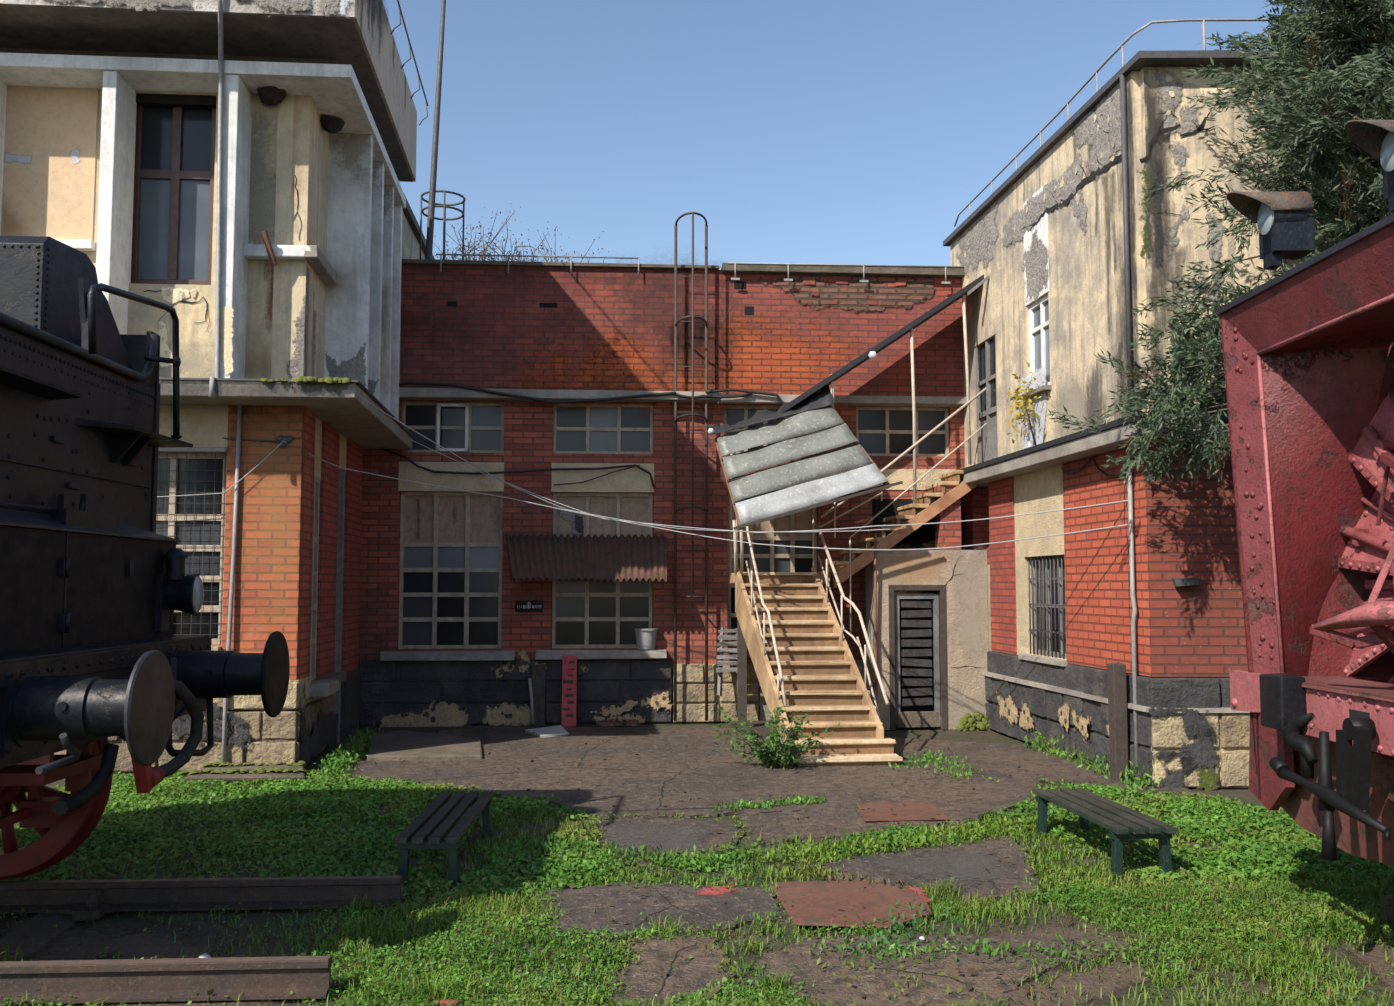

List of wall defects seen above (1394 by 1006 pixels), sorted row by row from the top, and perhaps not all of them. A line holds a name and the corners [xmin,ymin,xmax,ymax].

spalling [48,0,190,11]
spalling [235,0,353,17]
crack [293,175,302,241]
spalling [956,82,1122,302]
spalling [1155,66,1239,347]
water stain [1074,71,1182,427]
spalling [734,275,936,313]
peeling [158,321,173,367]
peeling [379,700,531,727]
peeling [590,691,674,723]
peeling [996,690,1034,731]
peeling [1058,702,1109,742]